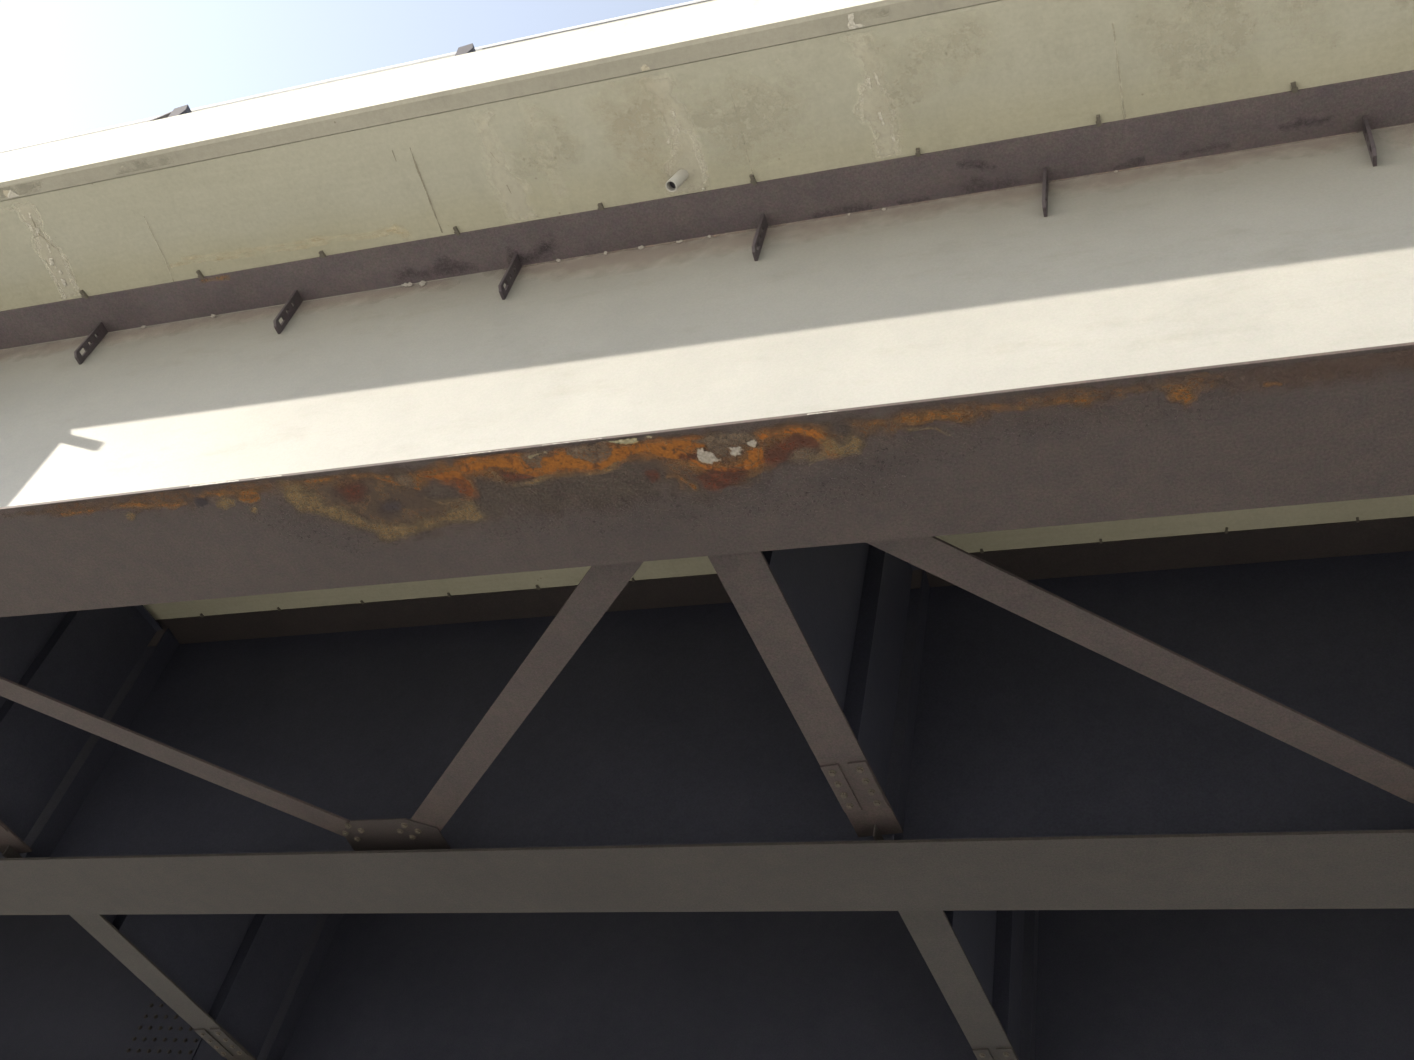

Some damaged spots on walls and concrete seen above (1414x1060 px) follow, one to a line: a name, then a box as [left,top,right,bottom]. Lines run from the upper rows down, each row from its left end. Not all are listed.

corrosion [10,418,864,541]
peeling [697,439,757,464]